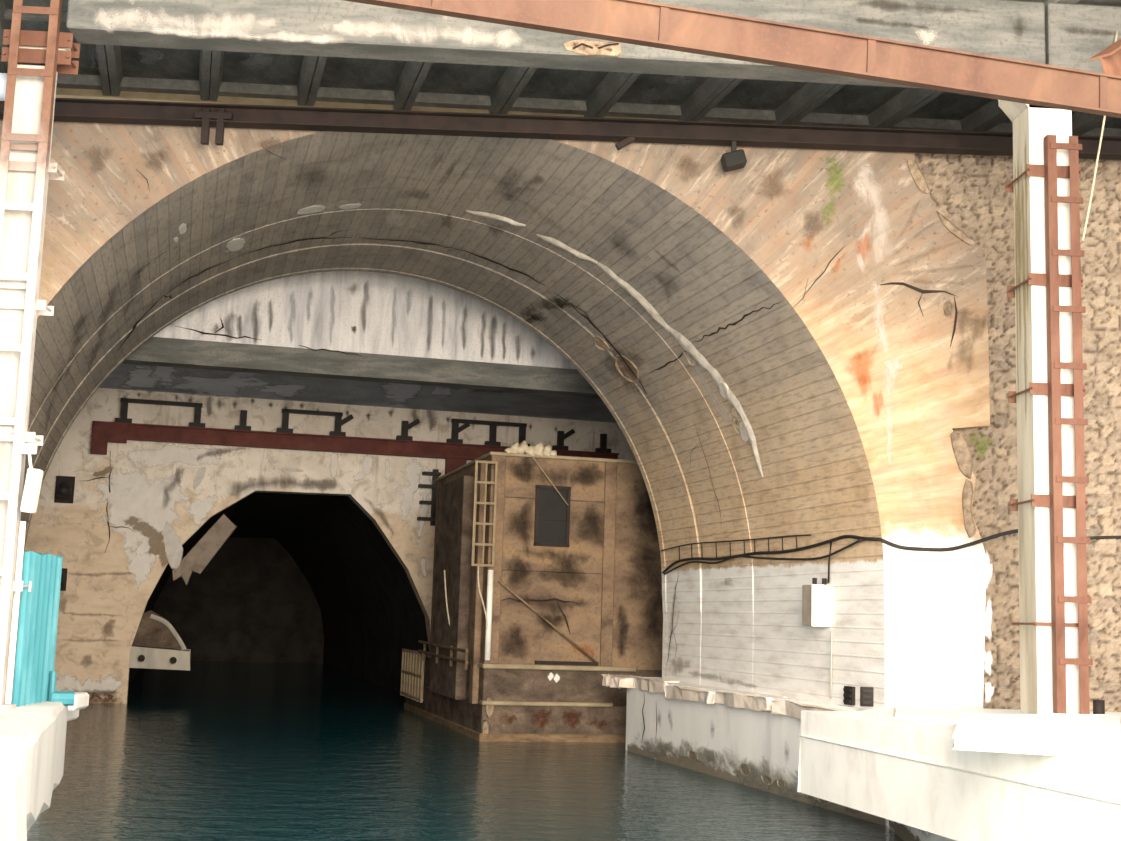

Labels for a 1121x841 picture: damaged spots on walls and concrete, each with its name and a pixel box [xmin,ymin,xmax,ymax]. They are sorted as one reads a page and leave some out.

crack [118,229,844,394]
leakage [465,210,763,477]
crack [880,282,958,347]
peeling [97,445,224,588]
leakage [636,496,656,532]
spalling [950,431,988,538]
leakage [638,548,662,631]
leakage [627,741,928,841]